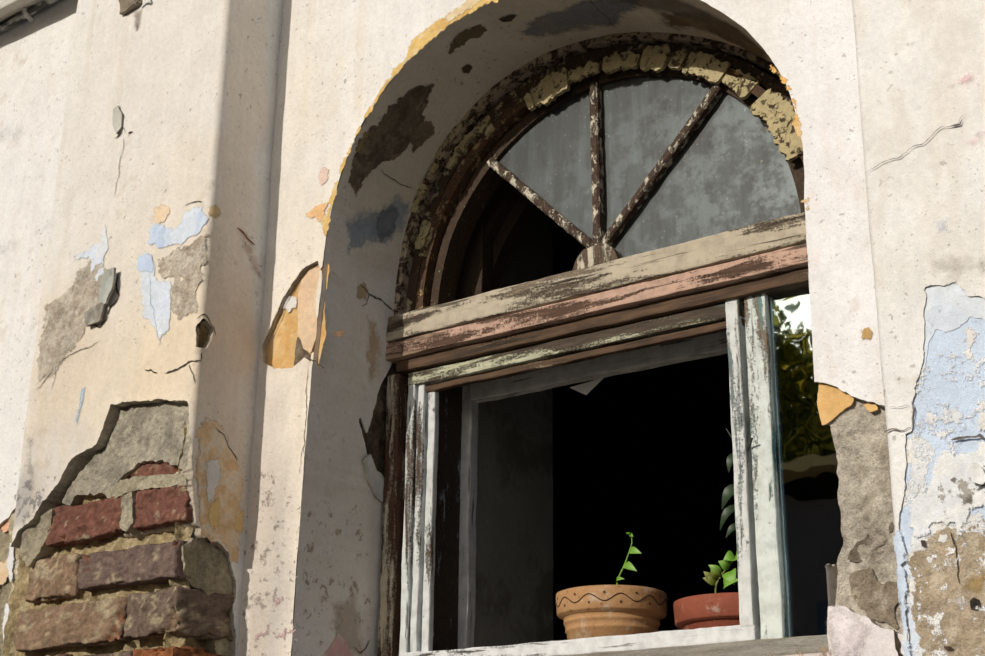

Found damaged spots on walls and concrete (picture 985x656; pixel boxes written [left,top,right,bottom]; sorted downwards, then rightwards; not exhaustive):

water stain [525,0,769,58]
spalling [306,0,498,257]
crack [868,114,965,171]
spalling [37,226,119,381]
spalling [137,201,221,348]
spalling [265,257,346,369]
spalling [0,402,244,656]
peeling [817,283,985,656]